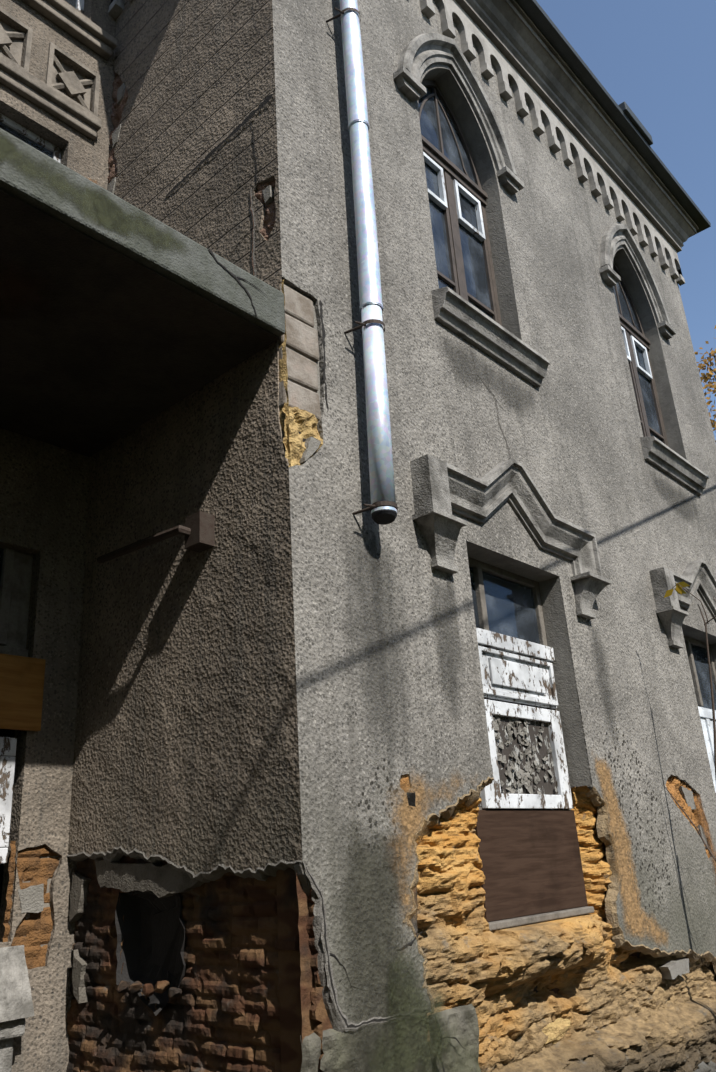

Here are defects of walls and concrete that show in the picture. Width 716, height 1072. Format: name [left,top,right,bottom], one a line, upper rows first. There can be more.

crack [165,92,274,315]
spalling [255,179,276,241]
spalling [278,279,329,467]
crack [468,343,511,459]
spalling [356,758,415,848]
spalling [3,841,374,1072]
spalling [403,728,716,1072]